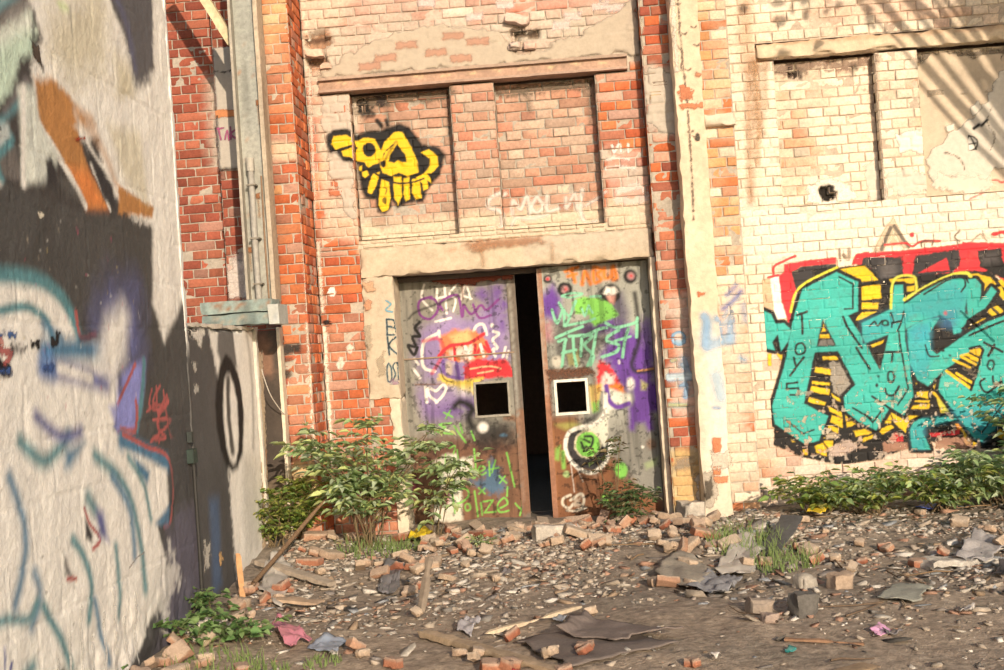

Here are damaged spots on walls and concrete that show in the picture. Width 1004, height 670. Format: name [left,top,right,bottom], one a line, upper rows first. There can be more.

spalling [305,32,332,70]
flaking render [359,32,489,71]
spalling [505,12,539,52]
flaking render [677,84,703,110]
flaking render [863,70,1004,201]
flaking render [675,438,732,508]